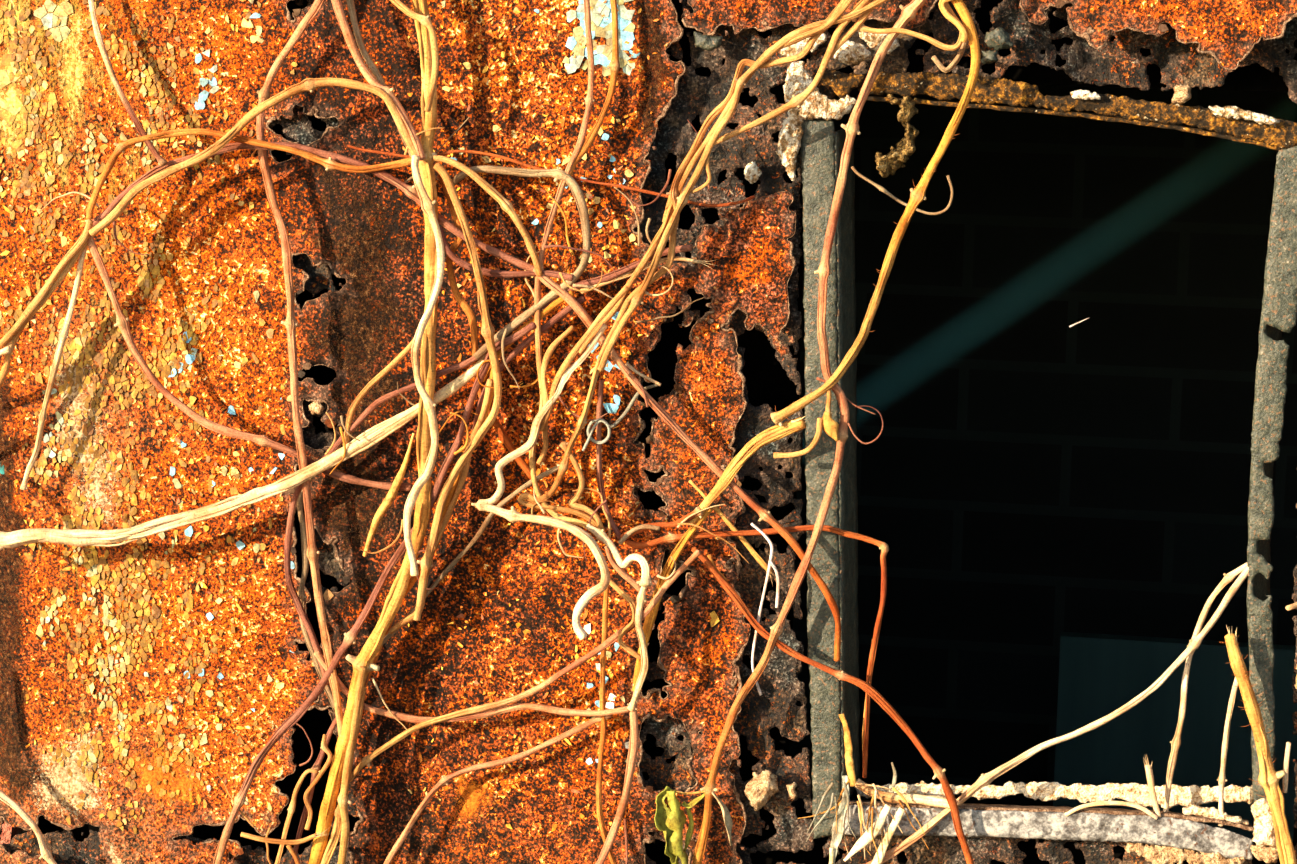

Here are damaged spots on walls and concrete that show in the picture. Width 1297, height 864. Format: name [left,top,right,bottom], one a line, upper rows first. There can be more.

peeling [433,0,659,165]
corrosion [638,4,669,138]
corrosion [52,337,117,523]
corrosion [297,164,413,554]
peeling [442,261,533,316]
peeling [489,356,630,535]
corrosion [0,366,105,819]
peeling [420,554,634,737]
corrosion [105,842,122,864]
corrosion [134,746,205,803]
peeling [459,733,572,829]
peeling [552,789,631,832]